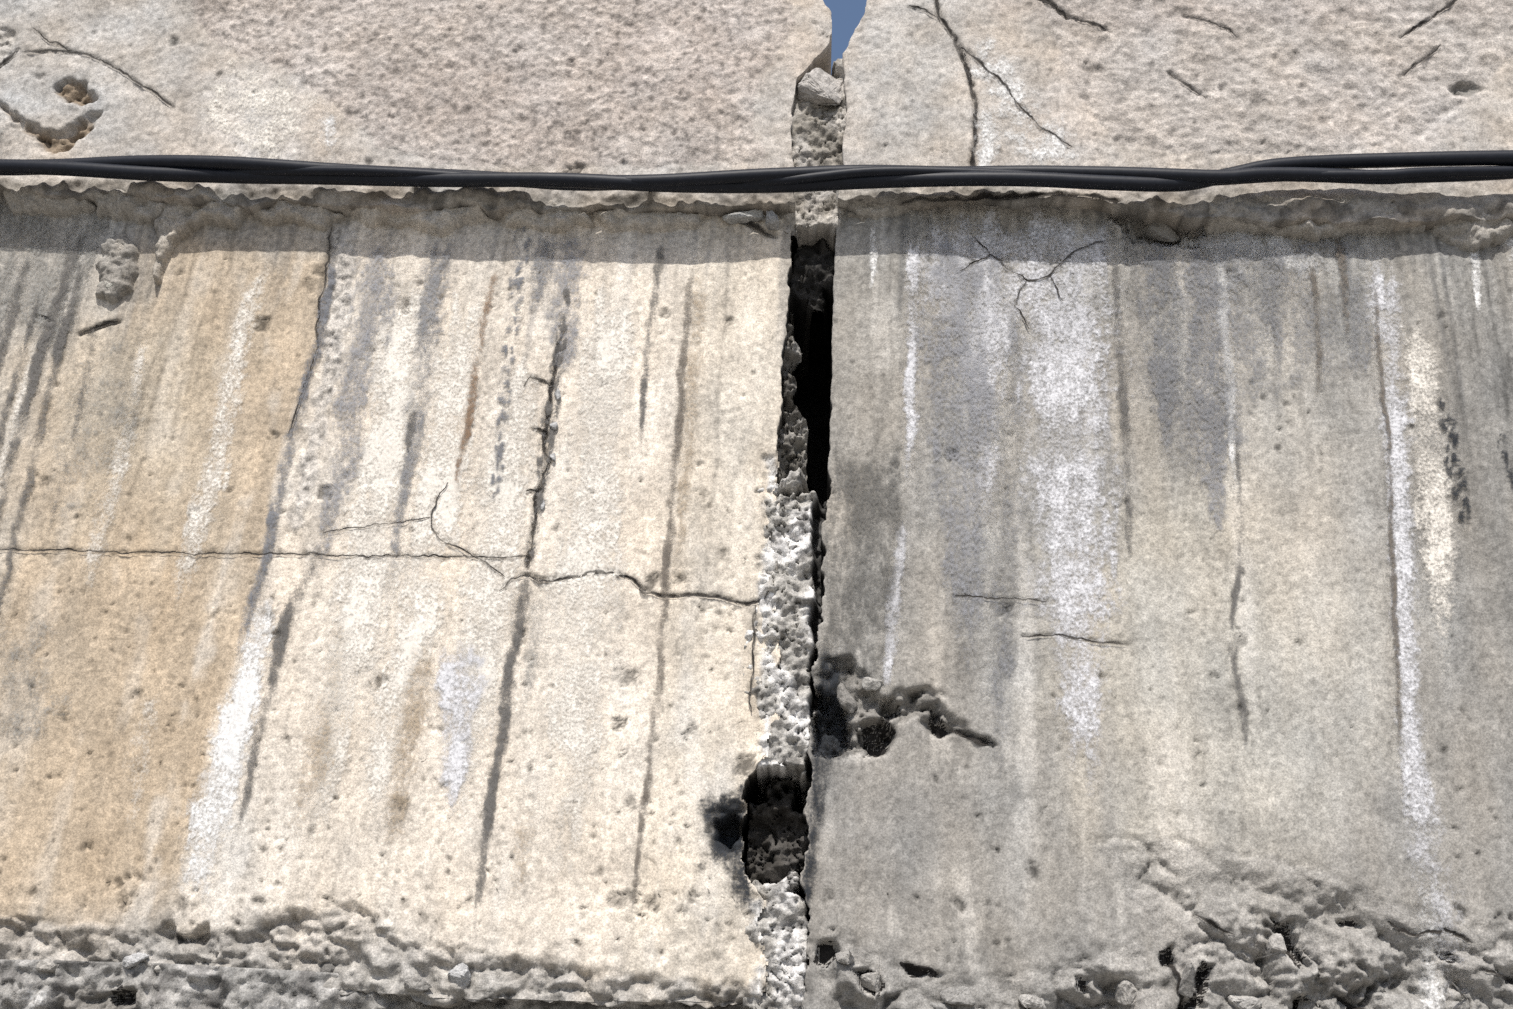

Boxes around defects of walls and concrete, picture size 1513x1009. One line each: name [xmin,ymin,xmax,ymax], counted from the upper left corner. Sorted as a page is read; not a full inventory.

spalling [8,76,103,154]
crack [28,28,172,106]
crack [902,0,1118,204]
crack [1401,0,1457,75]
damp [177,227,664,901]
crack [324,288,774,713]
damp [802,211,1133,900]
damp [1139,232,1471,1009]
spalling [810,659,993,761]
spalling [0,894,768,1009]
damp [698,784,760,912]
spalling [802,836,1513,1009]